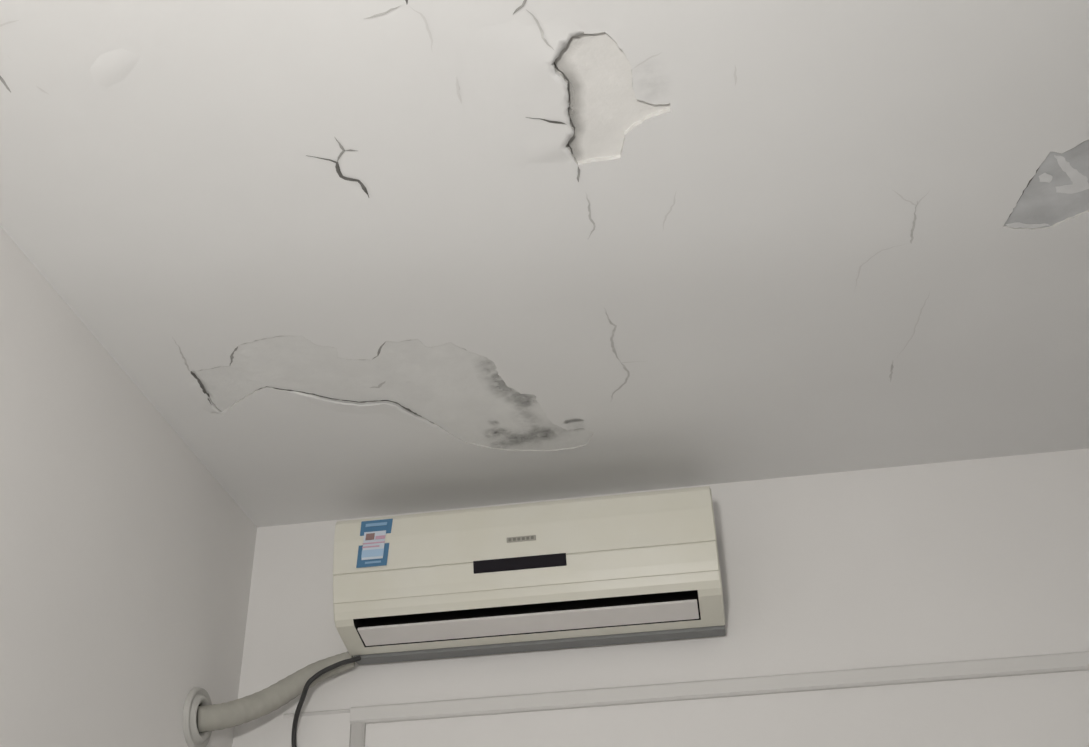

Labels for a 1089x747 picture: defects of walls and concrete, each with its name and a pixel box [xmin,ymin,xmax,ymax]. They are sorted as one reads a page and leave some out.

crack [364,0,433,49]
crack [306,138,369,197]
peeling [468,13,670,239]
peeling [1003,139,1089,230]
peeling [174,336,593,451]
crack [604,308,643,400]